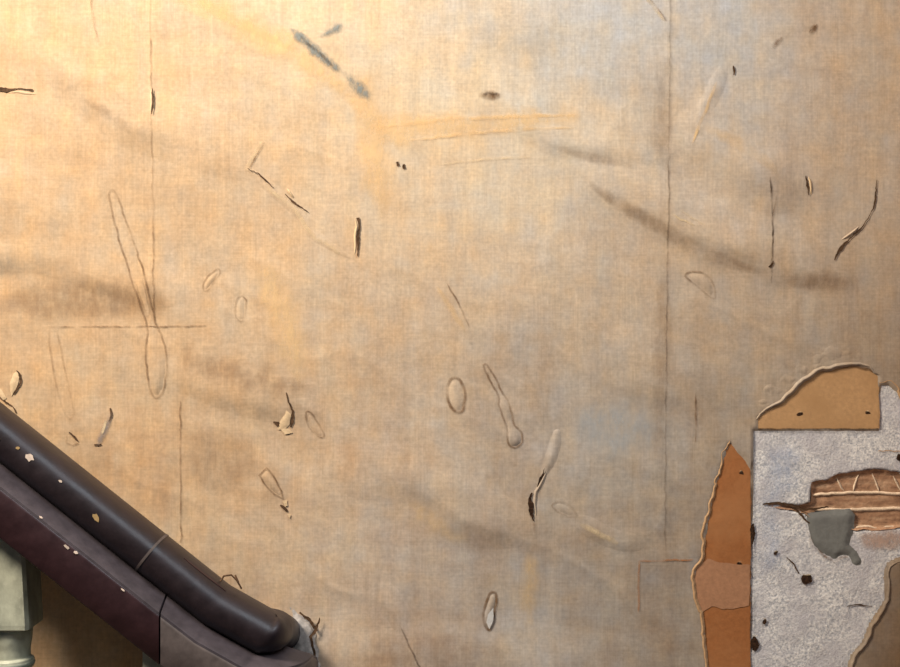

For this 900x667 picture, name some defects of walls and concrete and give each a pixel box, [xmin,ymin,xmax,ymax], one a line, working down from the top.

crack [353,218,361,256]
crack [834,181,877,260]
peeling [278,410,292,434]
peeling [691,346,900,667]